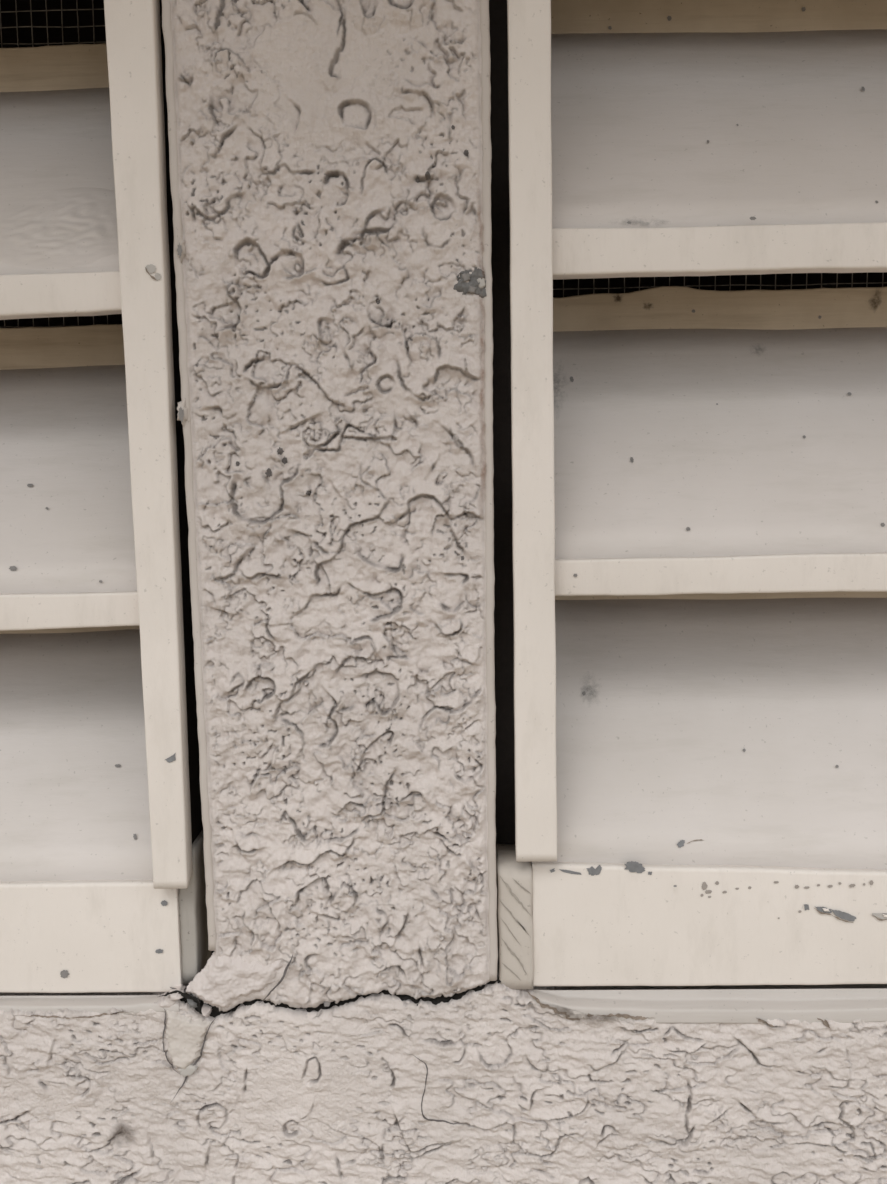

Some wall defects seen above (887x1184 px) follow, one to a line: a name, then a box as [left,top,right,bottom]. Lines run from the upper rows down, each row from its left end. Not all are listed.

peeling [700,881,752,898]
peeling [798,904,856,923]
crack [159,876,531,1102]